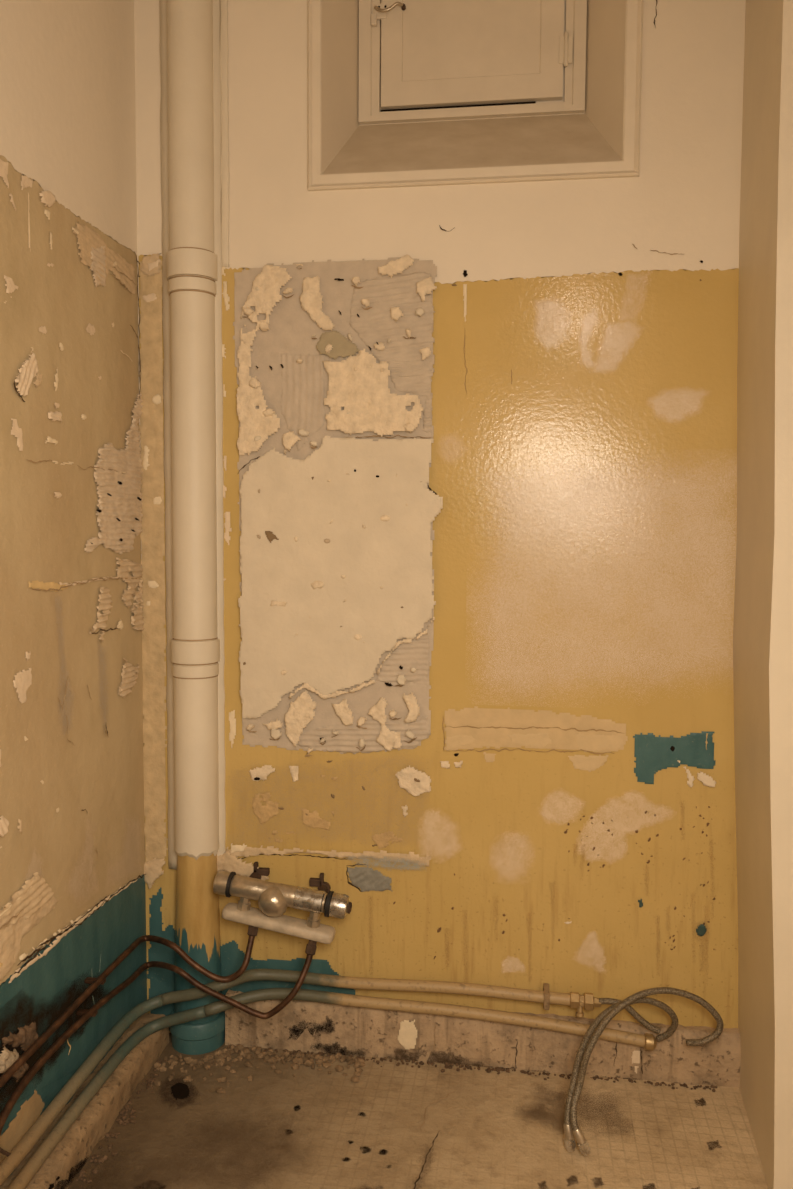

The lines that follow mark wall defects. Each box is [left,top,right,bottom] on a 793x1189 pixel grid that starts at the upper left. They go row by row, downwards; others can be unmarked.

flaking render [14,347,62,423]
flaking render [222,254,443,782]
peeling [575,731,716,787]
peeling [0,816,22,848]
flaking render [0,872,58,980]
leakage [287,1018,516,1070]
peeling [0,1090,45,1163]